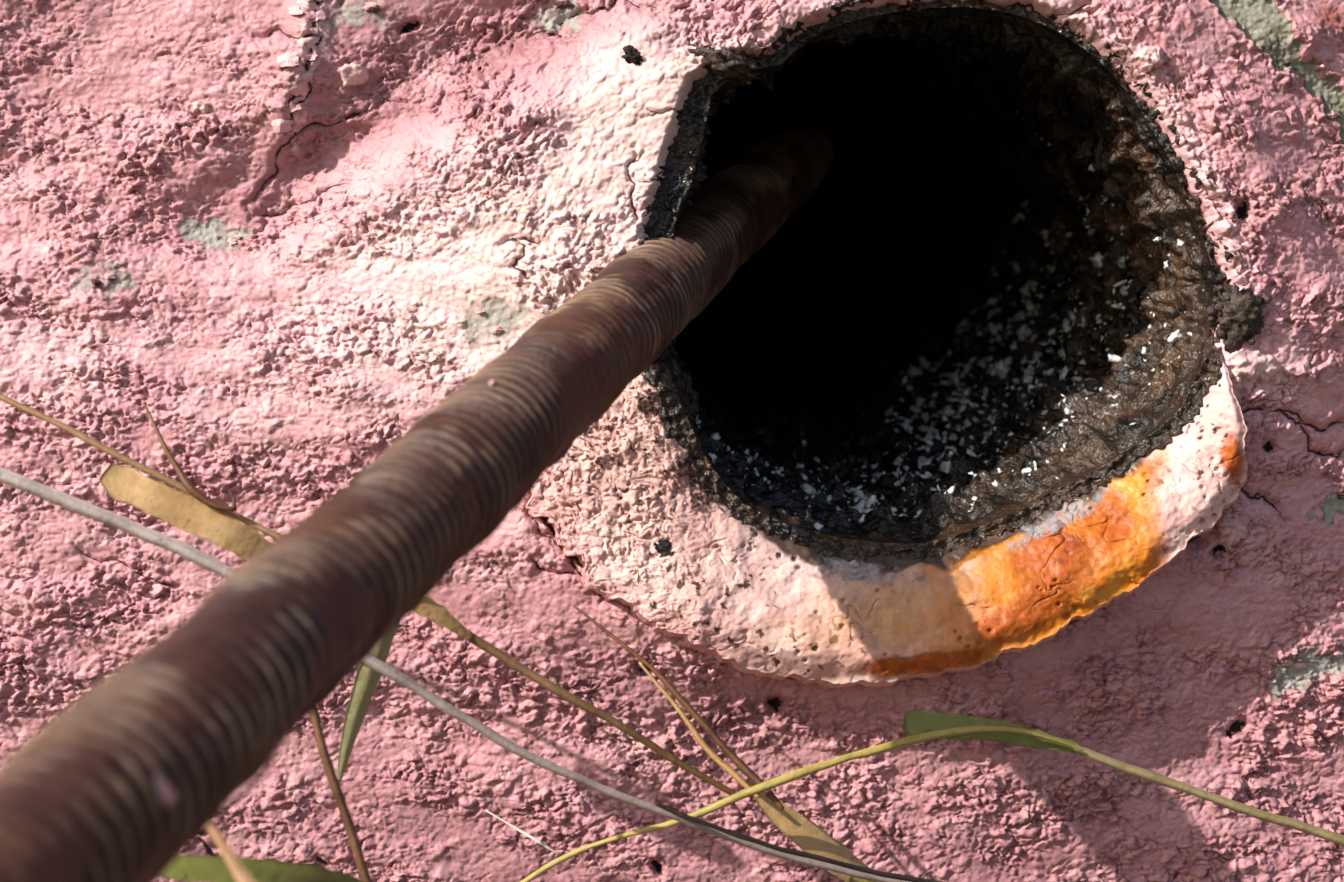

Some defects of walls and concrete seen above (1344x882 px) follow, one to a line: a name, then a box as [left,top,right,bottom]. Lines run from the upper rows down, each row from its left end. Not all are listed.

peeling [1210,0,1344,143]
crack [246,0,403,217]
spalling [1236,202,1248,220]
crack [1242,407,1343,458]
rust [1220,436,1244,481]
crack [1241,487,1283,519]
peeling [1309,488,1344,524]
rust [850,463,1161,677]
peeling [1269,649,1344,700]